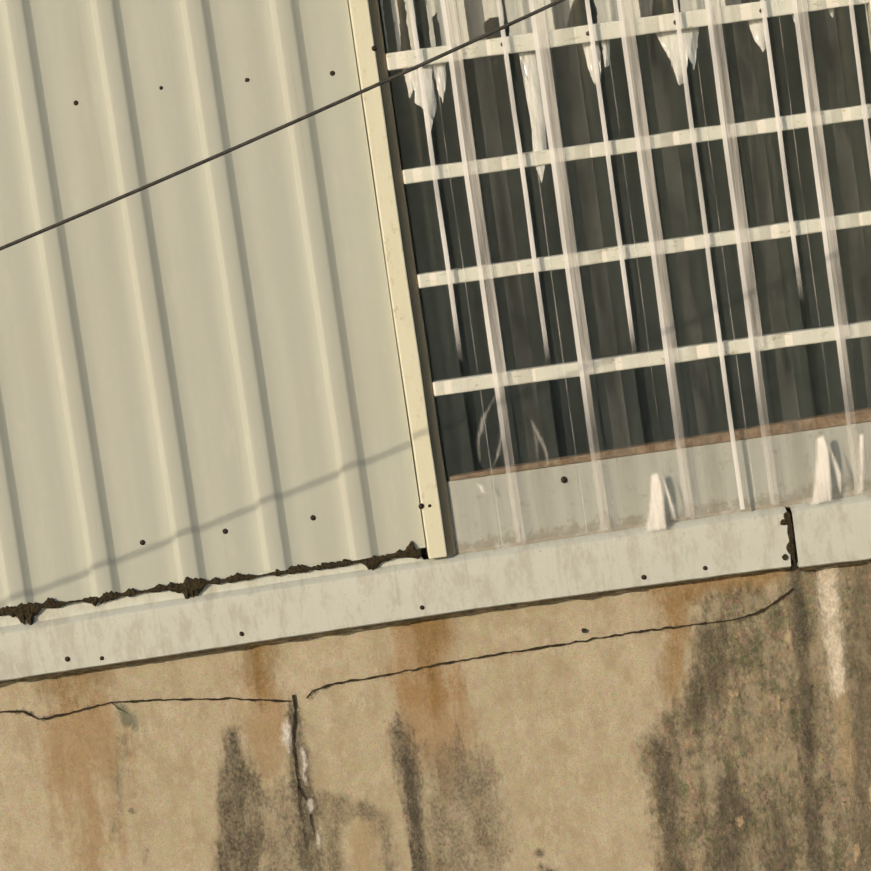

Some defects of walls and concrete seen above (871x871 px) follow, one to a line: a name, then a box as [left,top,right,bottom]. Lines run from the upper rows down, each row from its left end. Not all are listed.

leakage [217,705,344,871]
crack [0,588,793,858]
leakage [392,719,501,871]
leakage [642,552,871,871]